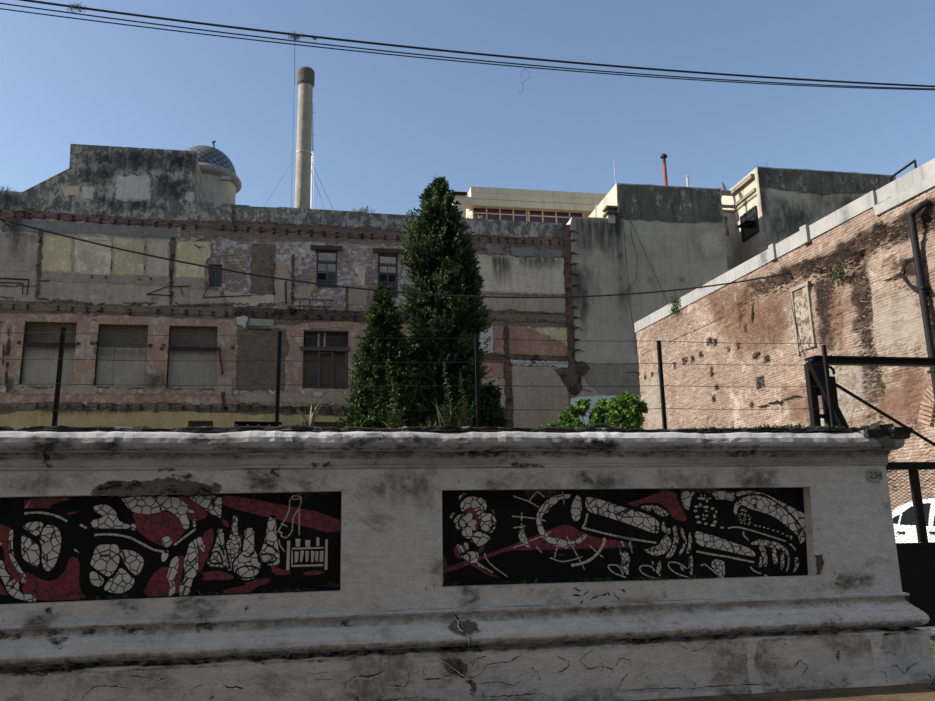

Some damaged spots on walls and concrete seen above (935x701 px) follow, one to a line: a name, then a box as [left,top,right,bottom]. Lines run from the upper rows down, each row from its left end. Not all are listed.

water stain [80,153,192,196]
flaking render [0,211,409,240]
peeling [91,477,222,498]
spalling [448,620,480,636]
crack [307,611,809,701]
crack [190,684,243,692]